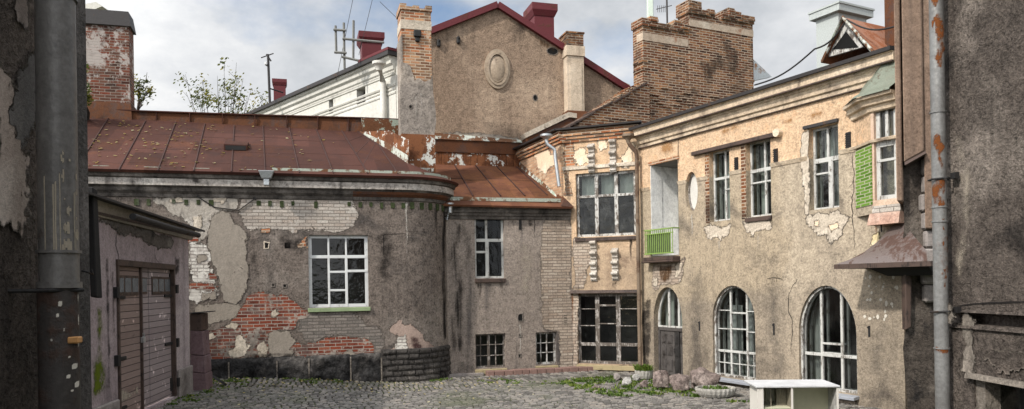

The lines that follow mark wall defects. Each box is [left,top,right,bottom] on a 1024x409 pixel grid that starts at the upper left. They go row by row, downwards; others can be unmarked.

rust [931,0,945,67]
flaking render [0,48,36,238]
flaking render [534,136,608,196]
flaking render [619,142,636,169]
flaking render [800,129,850,245]
rust [932,134,945,206]
flaking render [153,197,359,248]
water stain [435,210,461,267]
flaking render [704,216,772,242]
flaking render [189,272,218,291]
flaking render [209,291,435,360]
water stain [442,276,462,350]